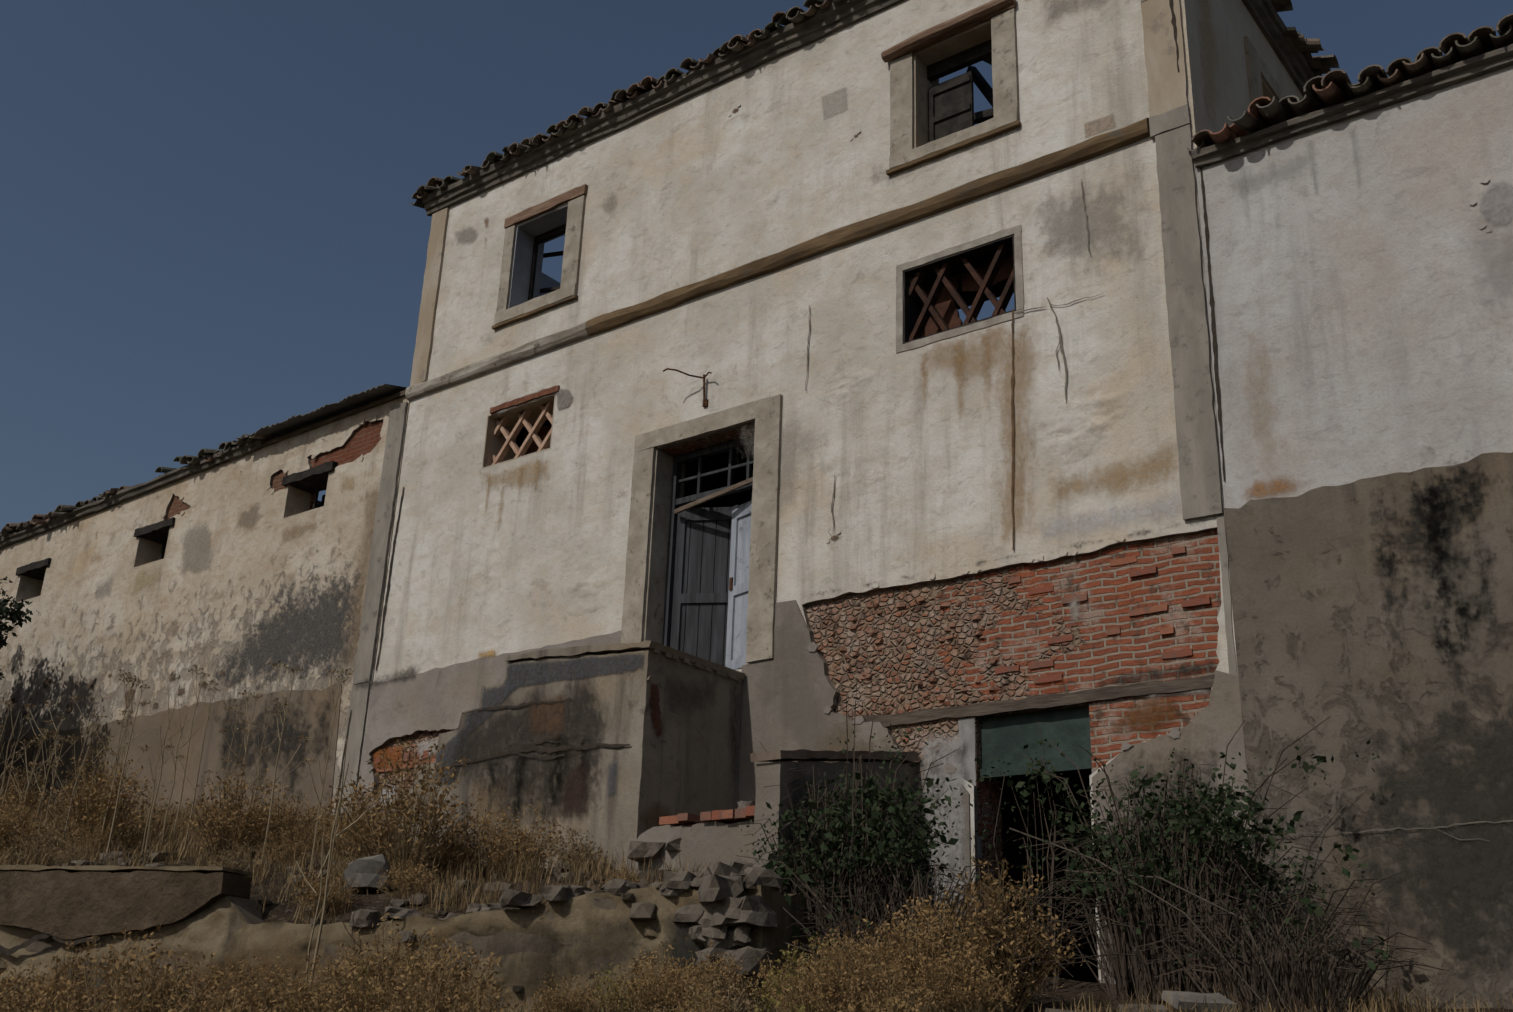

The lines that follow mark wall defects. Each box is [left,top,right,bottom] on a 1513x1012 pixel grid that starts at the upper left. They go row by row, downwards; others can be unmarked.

crack [1169,0,1180,72]
crack [1081,179,1091,256]
spalling [311,415,383,466]
crack [1011,293,1103,550]
damp [210,564,414,791]
spalling [365,739,438,805]
damp [452,685,616,823]
spalling [807,583,986,680]
spalling [923,736,965,907]
spalling [881,548,1088,705]
spalling [1107,597,1215,751]
damp [1345,462,1513,978]